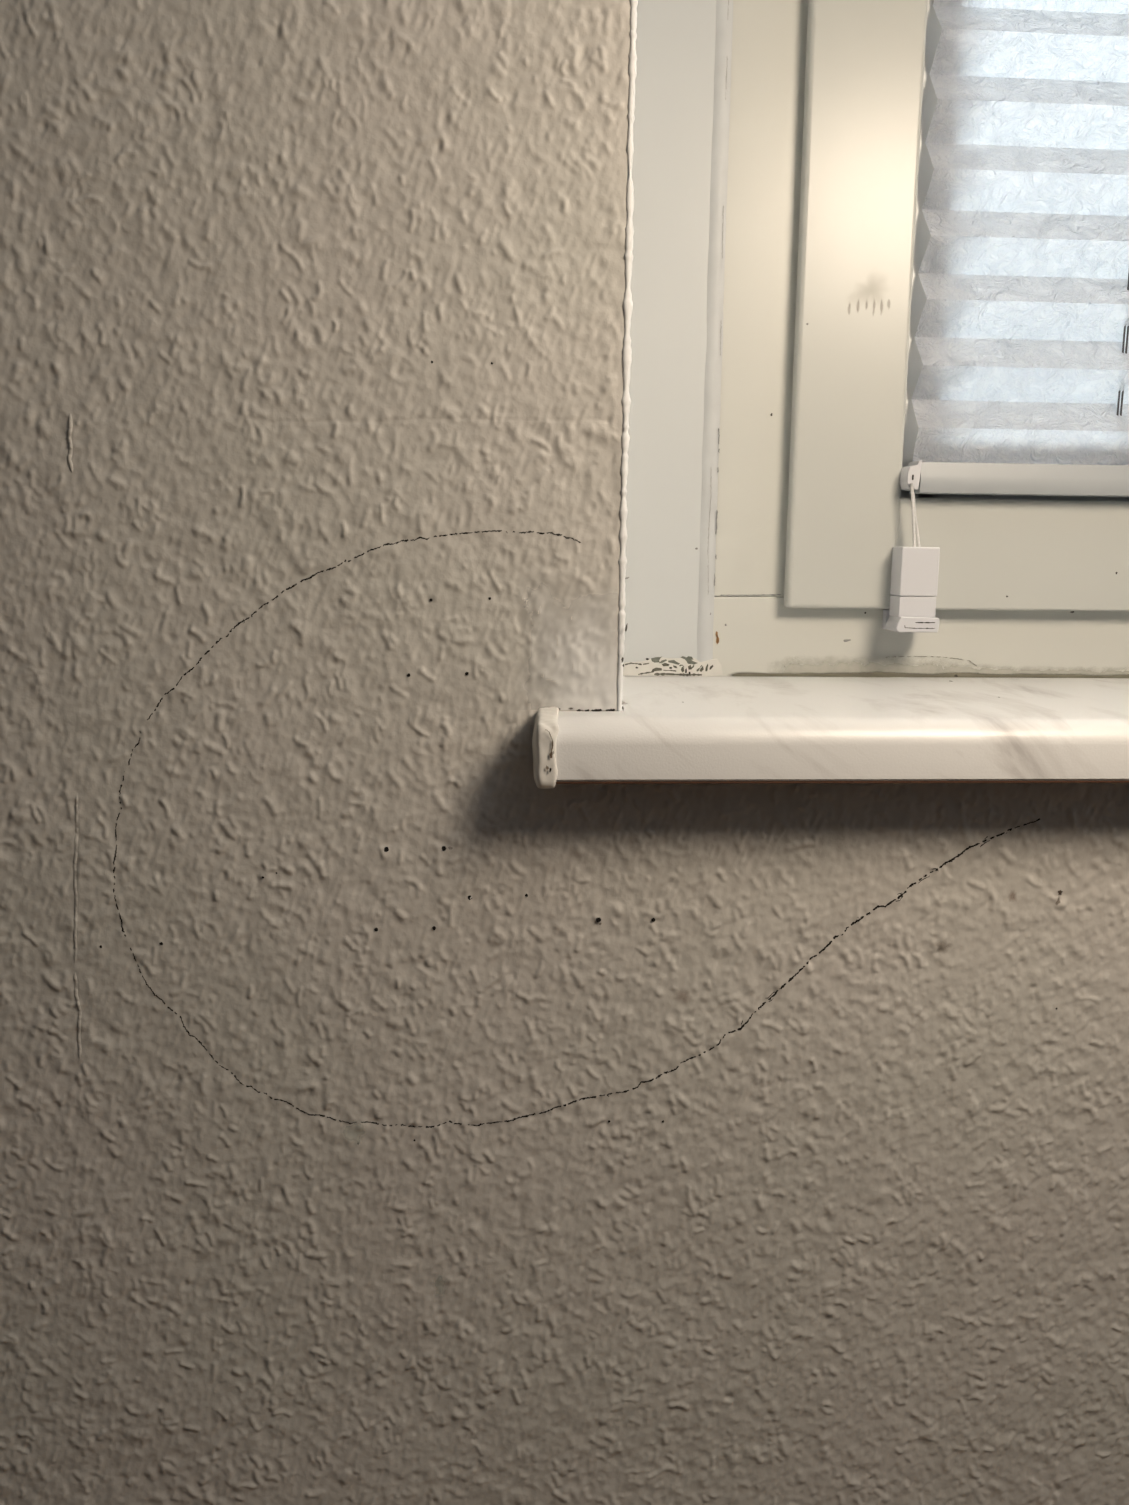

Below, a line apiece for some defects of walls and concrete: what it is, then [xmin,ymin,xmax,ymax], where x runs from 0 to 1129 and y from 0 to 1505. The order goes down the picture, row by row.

crack [113,530,1040,1128]